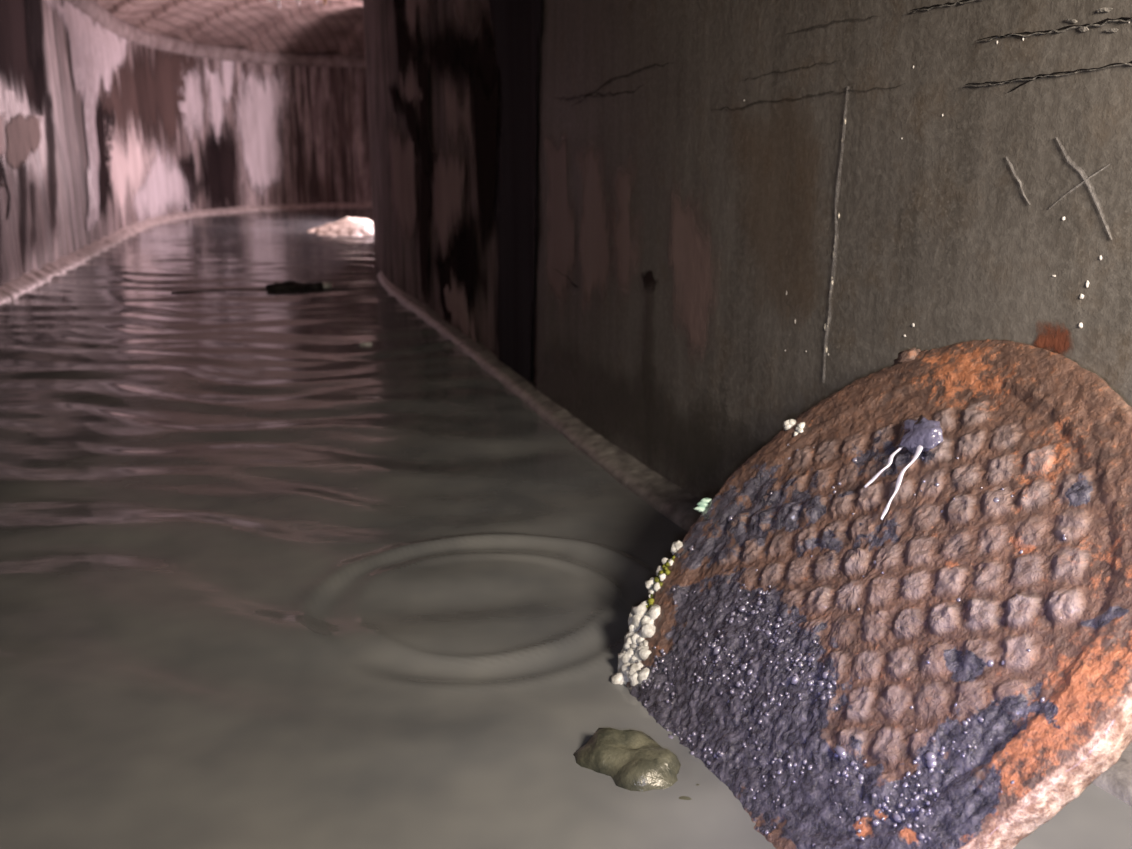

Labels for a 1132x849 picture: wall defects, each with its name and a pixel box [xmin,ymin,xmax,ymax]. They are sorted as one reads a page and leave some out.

water stain [0,0,58,233]
crack [911,0,984,13]
crack [965,61,1132,93]
crack [977,8,1132,45]
water stain [20,164,37,267]
water stain [390,0,722,478]